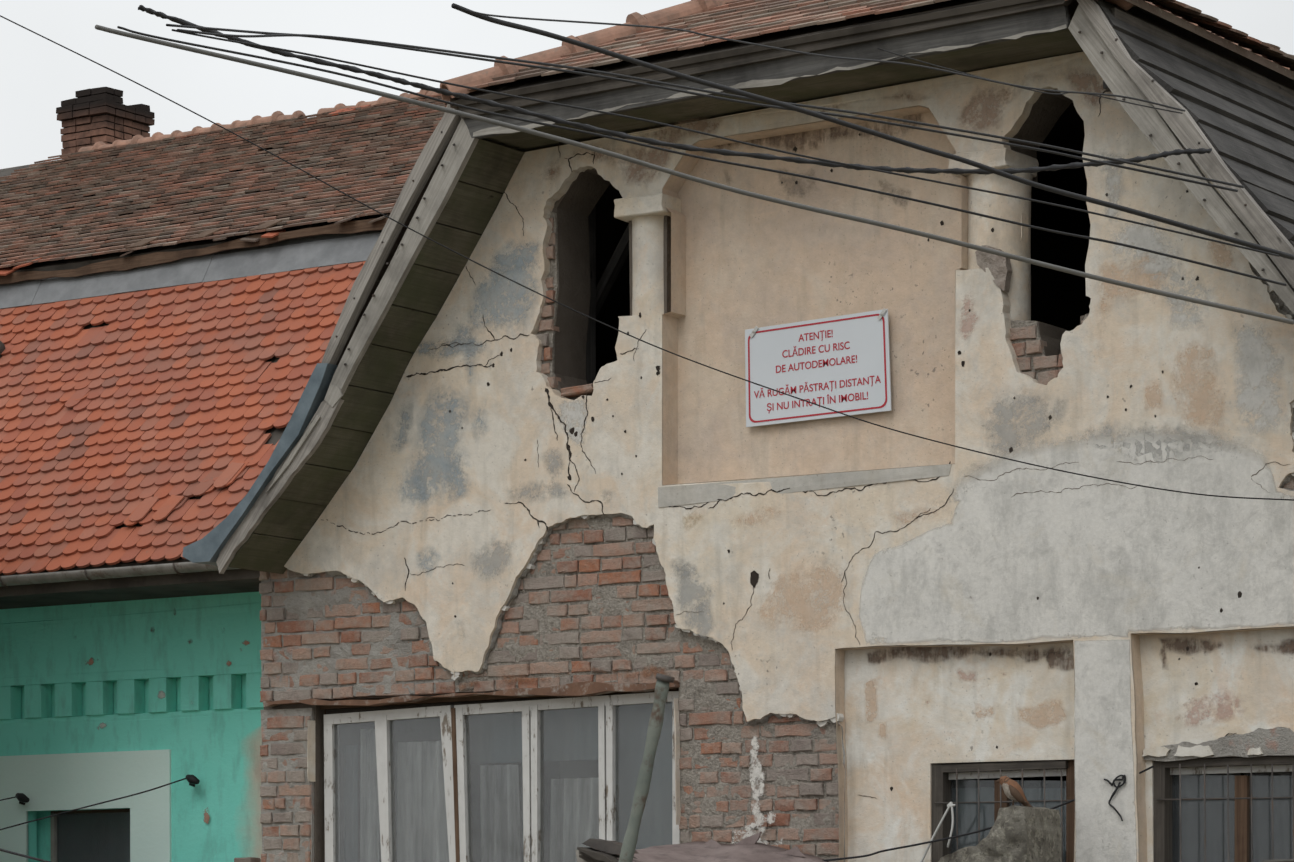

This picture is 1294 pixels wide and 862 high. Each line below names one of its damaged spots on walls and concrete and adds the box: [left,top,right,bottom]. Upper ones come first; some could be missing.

spalling [975,228,1013,292]
spalling [1251,265,1294,320]
crack [406,317,529,378]
spalling [1010,320,1063,385]
crack [537,330,646,515]
crack [404,558,465,590]
crack [326,501,548,535]
crack [668,456,1212,644]
peeling [859,436,1294,862]
spalling [240,513,846,862]